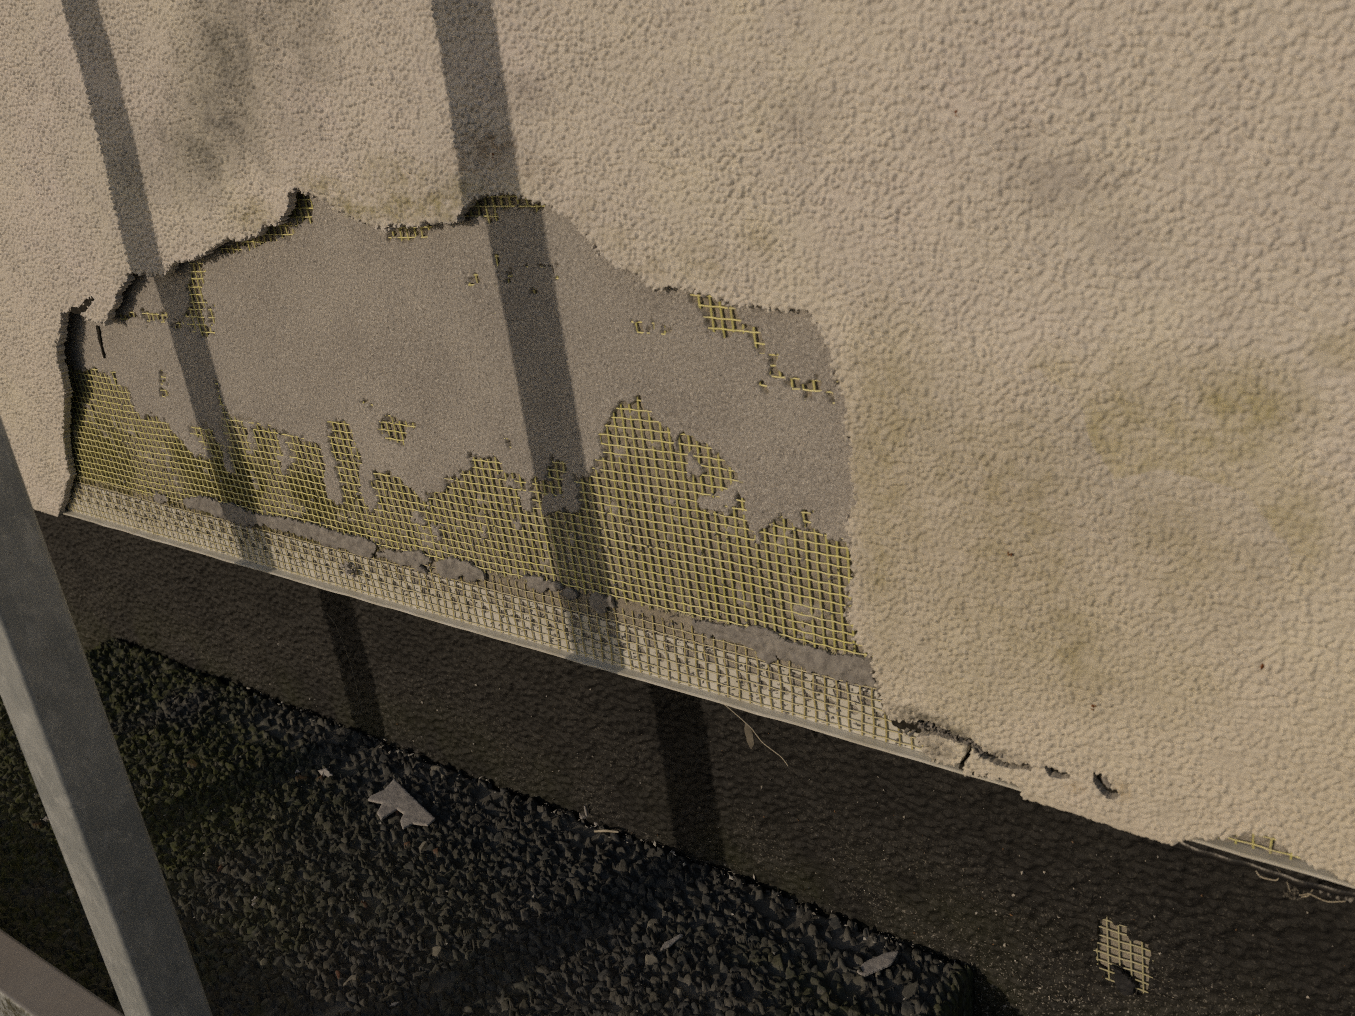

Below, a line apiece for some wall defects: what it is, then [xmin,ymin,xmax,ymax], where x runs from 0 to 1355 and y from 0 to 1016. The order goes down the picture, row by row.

flaking render [63,191,1003,758]
crack [889,716,1030,770]
flaking render [1175,833,1355,898]
peeling [1093,916,1154,996]